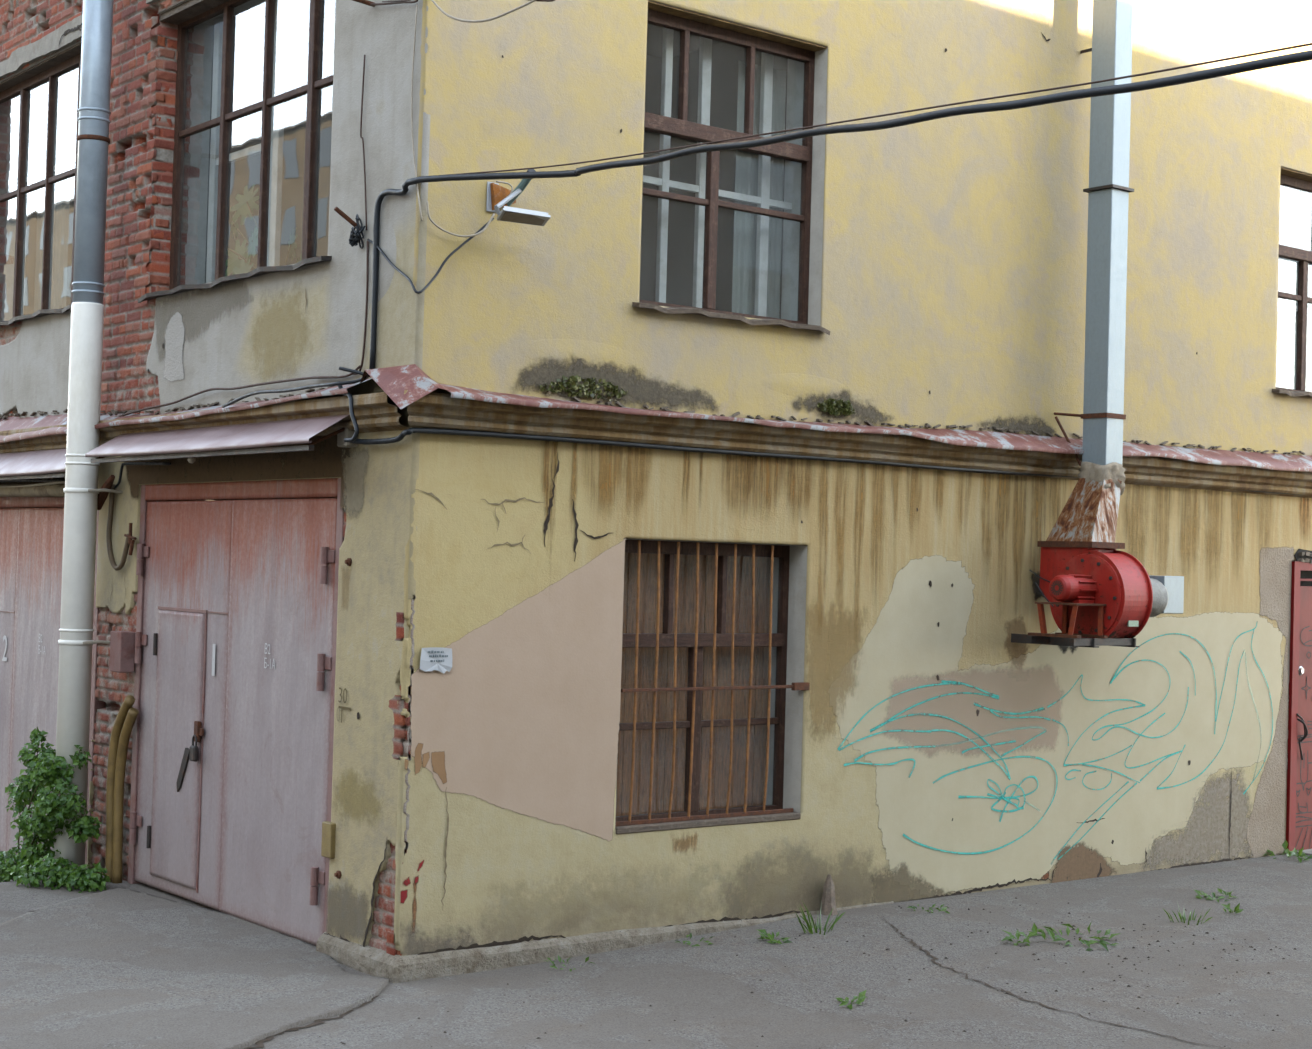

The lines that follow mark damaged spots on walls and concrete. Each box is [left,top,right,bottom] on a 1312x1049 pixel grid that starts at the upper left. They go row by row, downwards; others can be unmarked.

spalling [0,0,83,80]
spalling [0,101,23,345]
spalling [100,0,204,415]
crack [483,453,610,562]
leakage [571,443,645,503]
leakage [683,451,703,494]
leakage [726,454,918,608]
leakage [935,470,943,506]
leakage [969,472,1059,587]
leakage [1125,485,1246,562]
spalling [368,595,416,956]